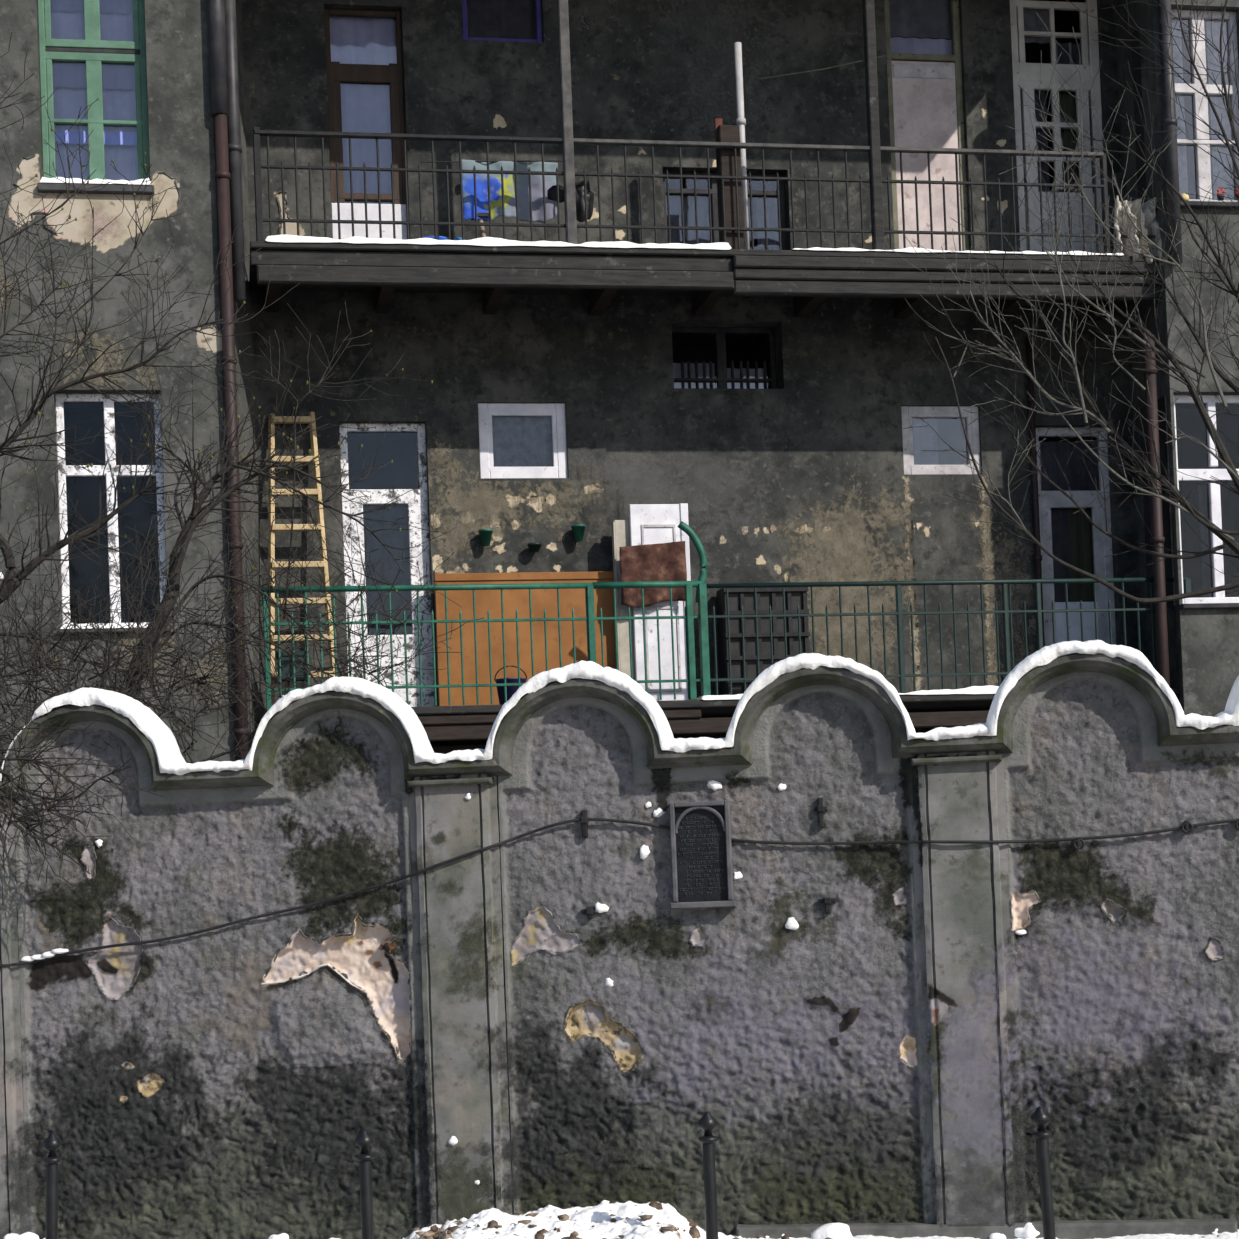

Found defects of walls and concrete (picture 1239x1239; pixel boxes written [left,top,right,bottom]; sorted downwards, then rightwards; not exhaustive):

peeling [8,154,180,253]
peeling [461,491,556,573]
spalling [20,911,157,1000]
spalling [261,914,412,1062]
spalling [511,906,582,967]
spalling [1011,891,1040,935]
spalling [563,999,645,1072]
spalling [119,1061,165,1103]
water stain [0,1003,437,1239]
water stain [474,1012,659,1203]
water stain [626,1068,677,1098]
water stain [760,1002,1233,1227]